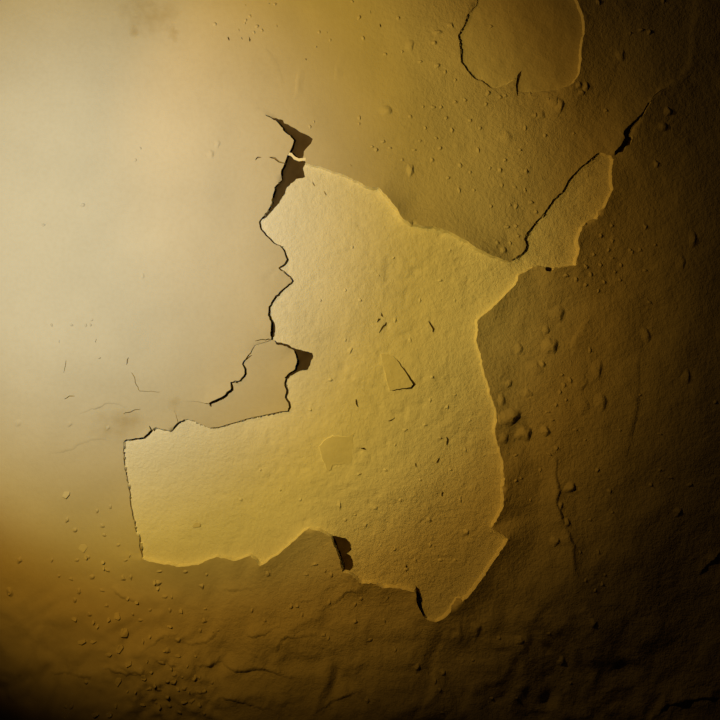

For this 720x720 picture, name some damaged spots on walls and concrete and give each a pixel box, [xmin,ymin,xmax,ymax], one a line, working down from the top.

crack [210,115,326,428]
peeling [124,154,611,619]
peeling [458,0,583,93]
crack [515,91,660,258]